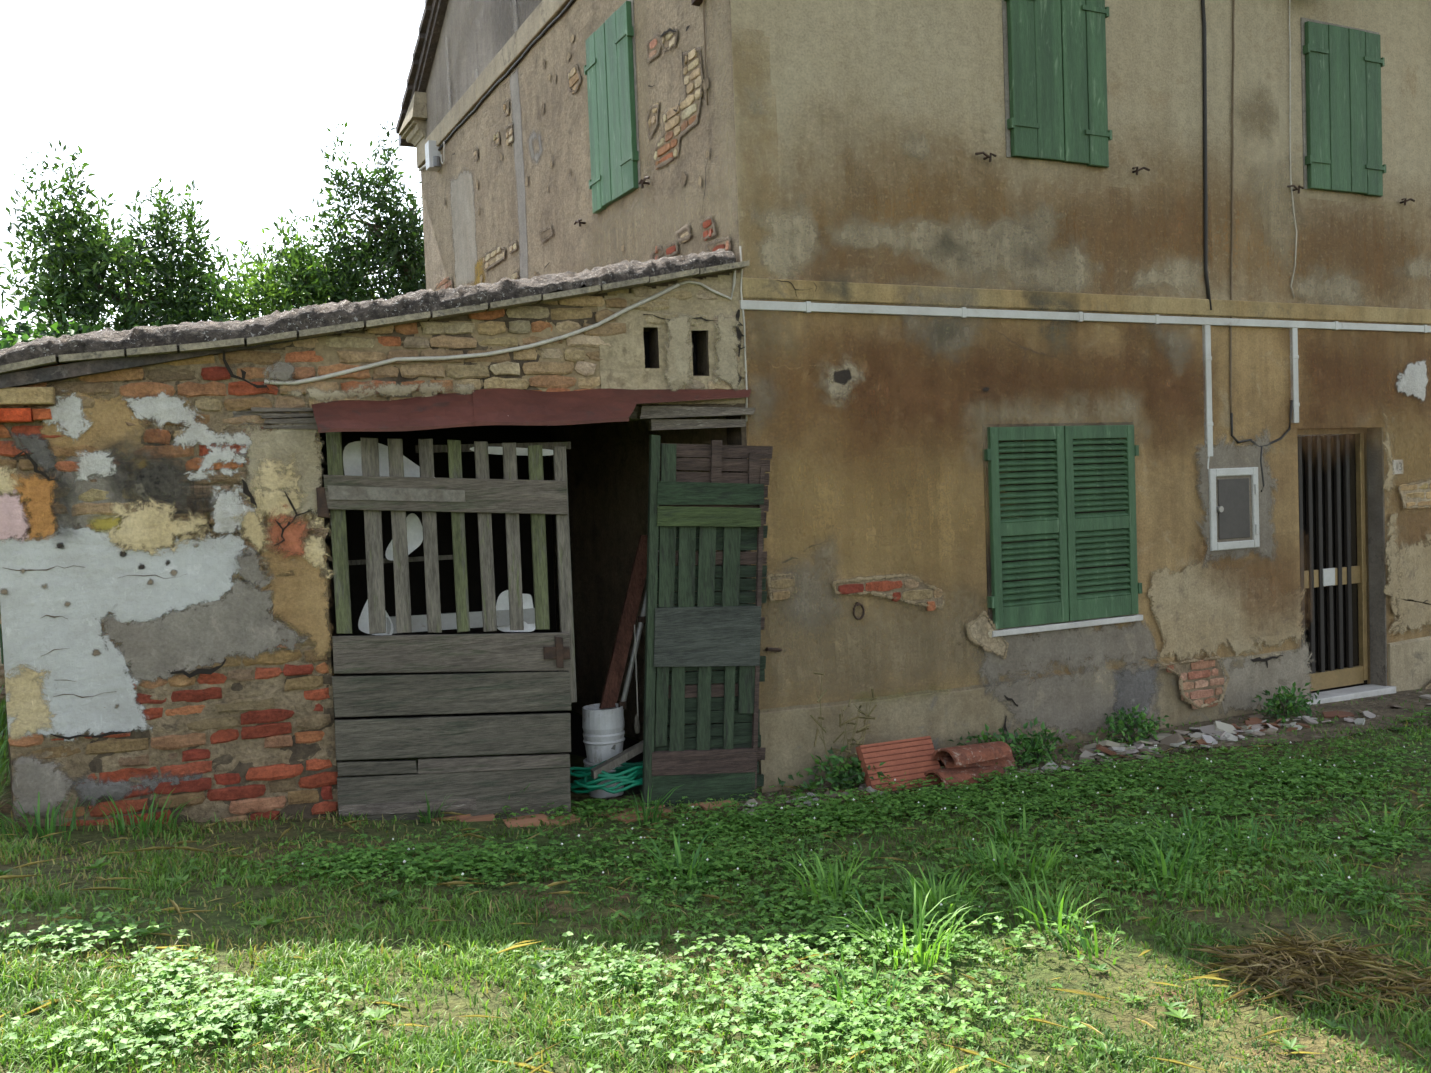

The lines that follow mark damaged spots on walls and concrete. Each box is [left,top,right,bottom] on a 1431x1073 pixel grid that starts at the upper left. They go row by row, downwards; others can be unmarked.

flaking render [646,28,709,170]
leakage [801,155,1431,351]
flaking render [825,362,862,397]
peeling [1396,359,1428,401]
peeling [0,524,253,741]
flaking render [832,574,945,611]
flaking render [966,611,1009,659]
peeling [1148,553,1306,709]
peeling [1383,412,1431,635]